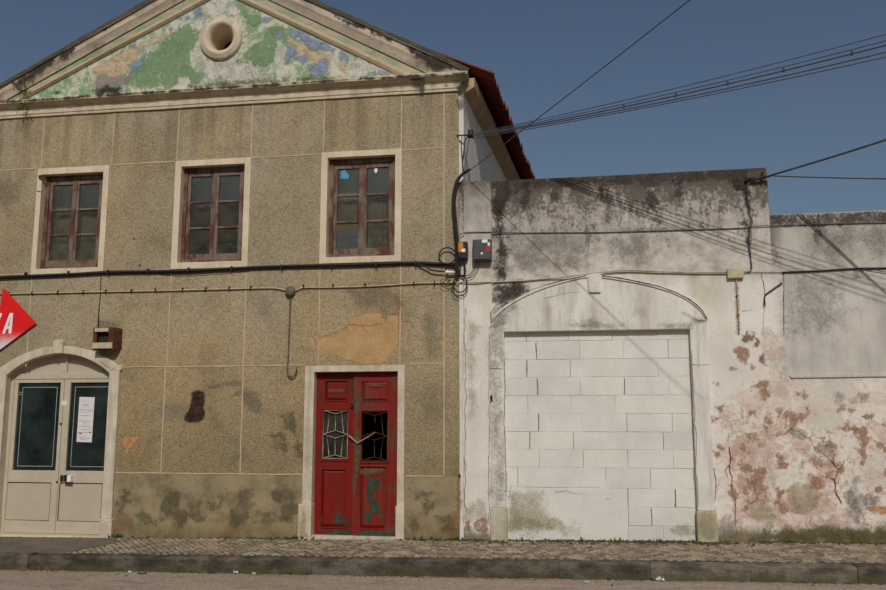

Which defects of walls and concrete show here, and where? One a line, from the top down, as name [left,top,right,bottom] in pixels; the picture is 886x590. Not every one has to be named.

peeling [92,0,391,90]
leakage [492,170,751,311]
leakage [770,211,886,237]
peeling [308,311,402,365]
peeling [319,430,395,537]
crack [691,350,737,535]
peeling [730,330,783,370]
peeling [714,390,810,514]
peeling [755,380,770,403]
peeling [837,404,886,466]